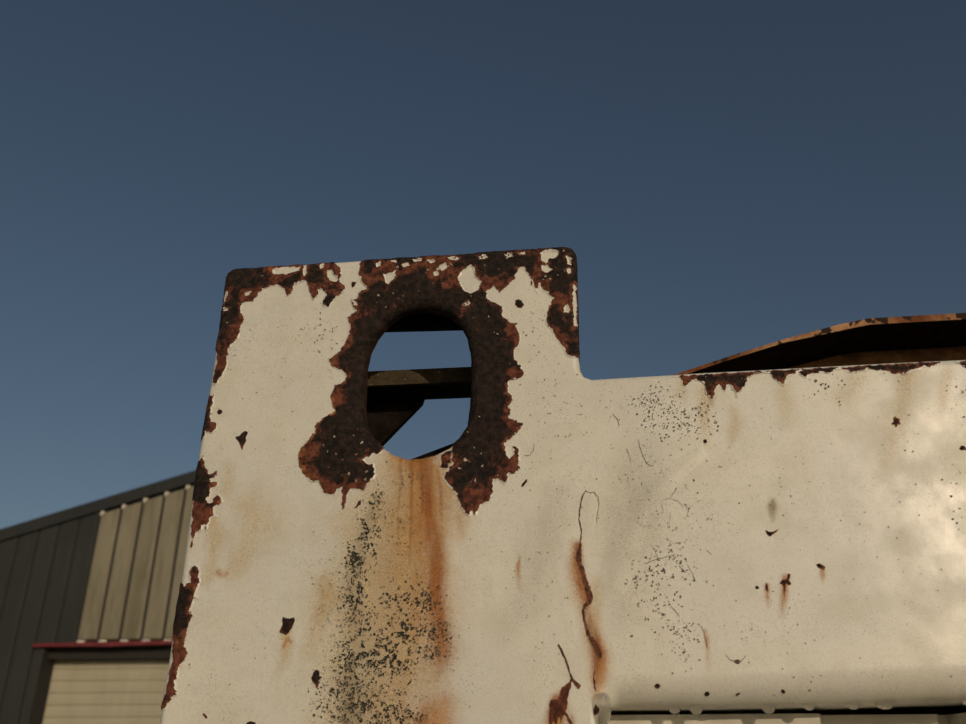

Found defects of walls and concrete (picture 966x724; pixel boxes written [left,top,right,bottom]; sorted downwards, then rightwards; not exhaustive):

rust [673,361,941,400]
rust [189,455,224,548]
rust [201,247,580,724]
rust [161,564,201,710]
crack [558,490,602,724]